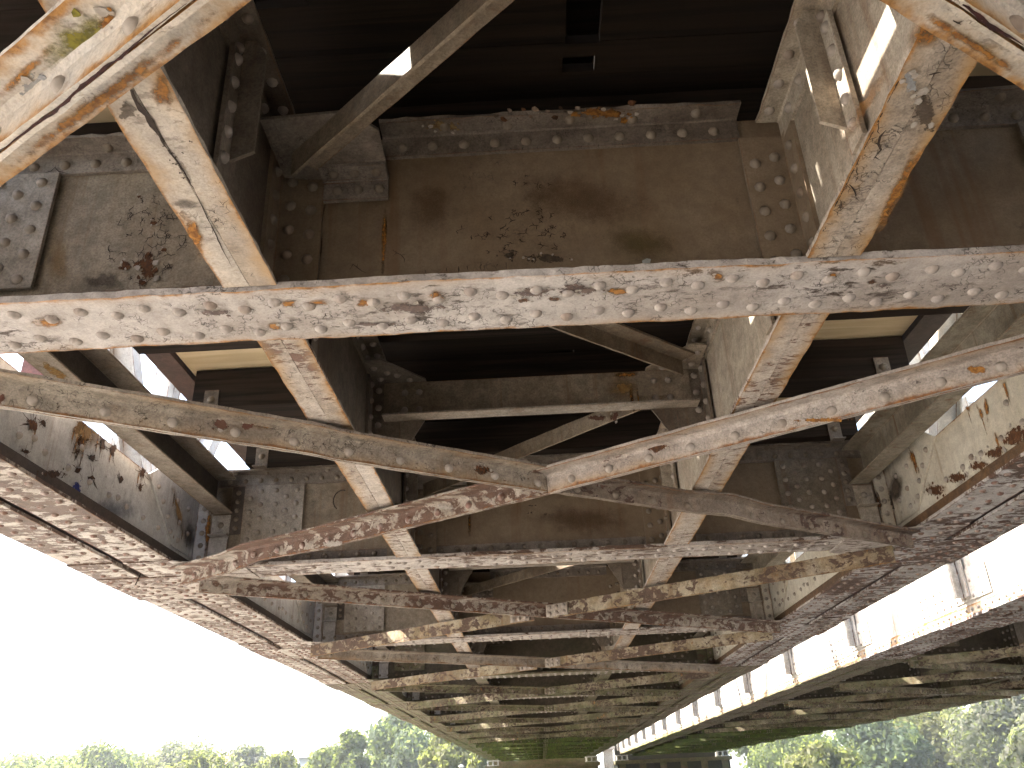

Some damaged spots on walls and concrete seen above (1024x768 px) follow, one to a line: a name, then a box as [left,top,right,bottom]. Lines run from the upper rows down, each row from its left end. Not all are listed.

corrosion [5,51,47,91]
corrosion [30,40,180,155]
corrosion [494,100,639,124]
crack [823,81,899,231]
corrosion [880,153,913,224]
crack [78,192,235,323]
peeling [356,301,449,328]
crack [393,175,566,308]
peeling [511,283,607,299]
corrosion [75,422,99,452]
corrosion [924,399,1024,499]